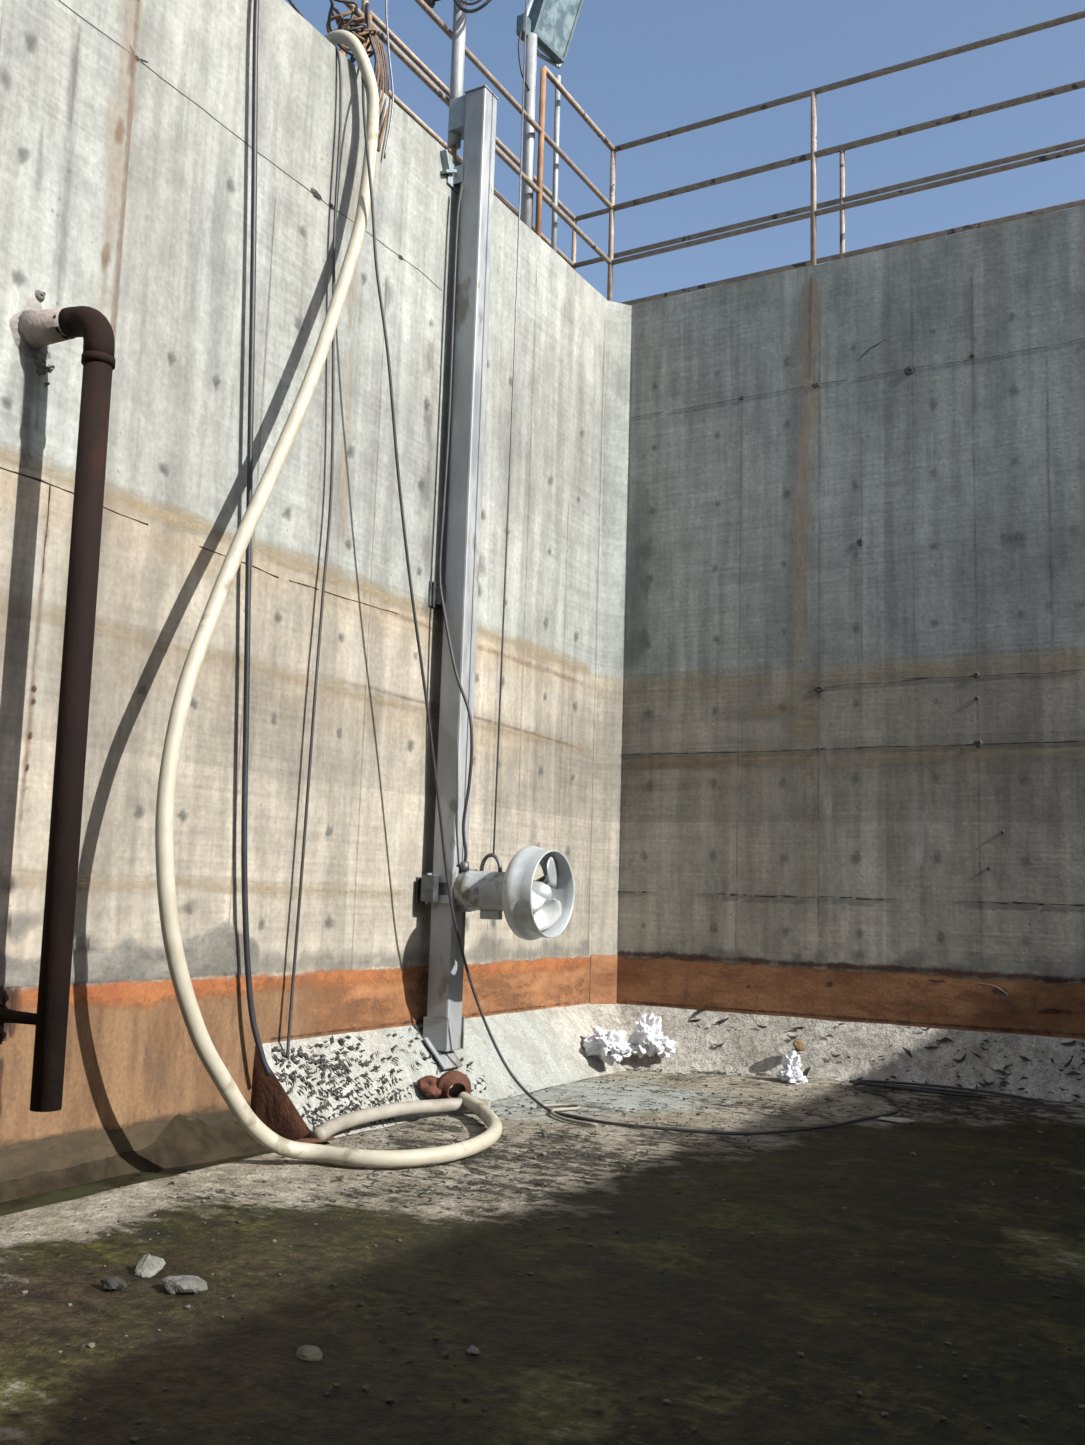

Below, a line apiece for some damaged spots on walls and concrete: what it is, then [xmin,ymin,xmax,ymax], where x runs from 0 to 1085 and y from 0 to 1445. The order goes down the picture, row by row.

water stain [26,364,40,418]
rust [0,979,229,1146]
rust [191,966,429,1104]
rust [462,951,1085,1039]
water stain [0,1109,237,1182]
rust [296,1135,336,1143]